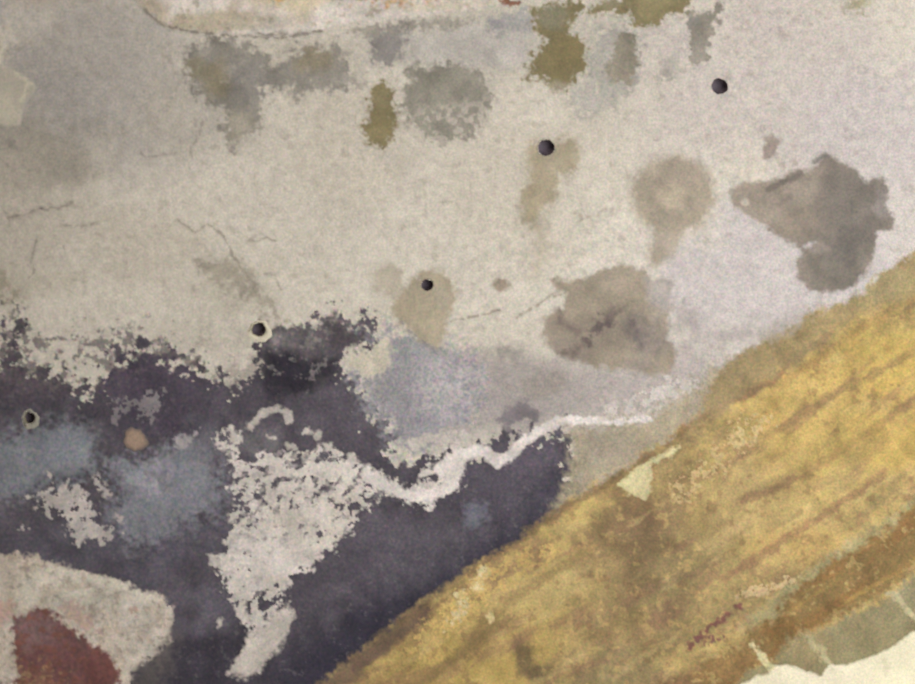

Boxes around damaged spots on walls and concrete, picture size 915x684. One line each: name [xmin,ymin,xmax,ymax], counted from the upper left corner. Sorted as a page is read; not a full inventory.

damp [172,0,898,379]
damp [493,396,545,434]
spalling [0,549,177,684]
damp [0,594,187,684]
peeling [733,574,805,604]
spalling [739,590,915,684]